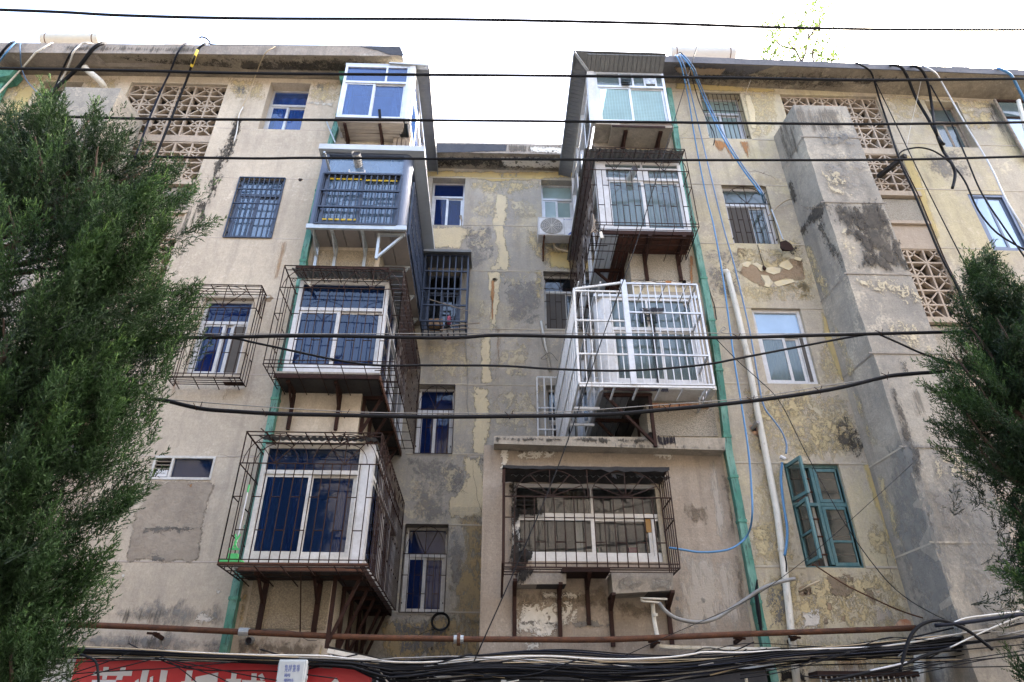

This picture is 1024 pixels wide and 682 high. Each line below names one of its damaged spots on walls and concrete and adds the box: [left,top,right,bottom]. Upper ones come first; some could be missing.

flaking render [711,241,828,301]
damp [778,106,908,271]
peeling [382,171,573,660]
peeling [745,390,870,563]
peeling [764,465,911,629]
mould [832,414,863,458]